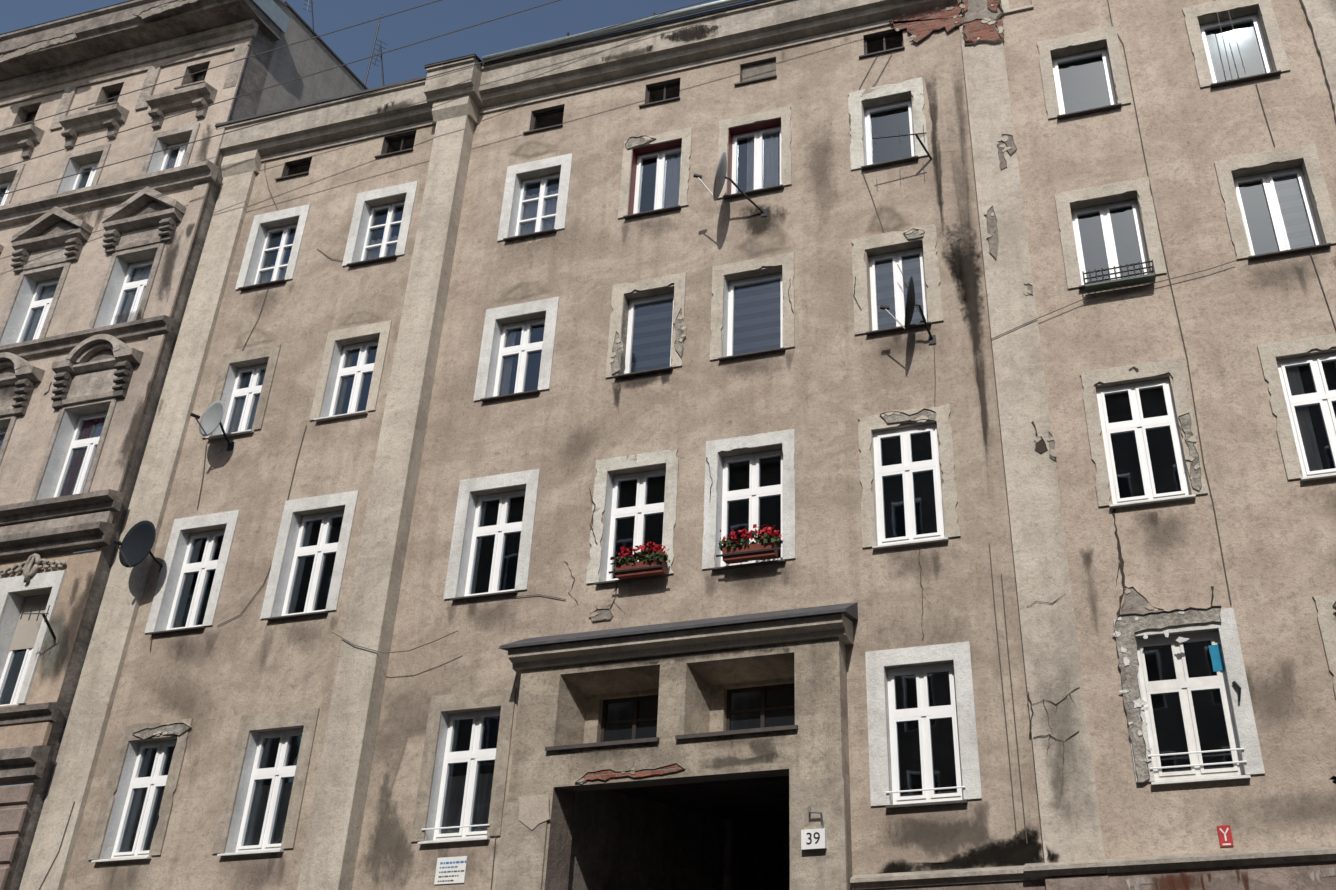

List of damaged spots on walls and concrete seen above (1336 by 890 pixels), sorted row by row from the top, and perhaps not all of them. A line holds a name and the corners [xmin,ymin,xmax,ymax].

spalling [889,0,1005,45]
water stain [929,103,943,212]
peeling [997,134,1017,170]
water stain [747,207,783,235]
peeling [984,206,999,260]
water stain [944,230,984,350]
water stain [977,370,988,442]
crack [1112,509,1128,616]
spalling [1112,586,1221,783]
water stain [883,821,1059,873]